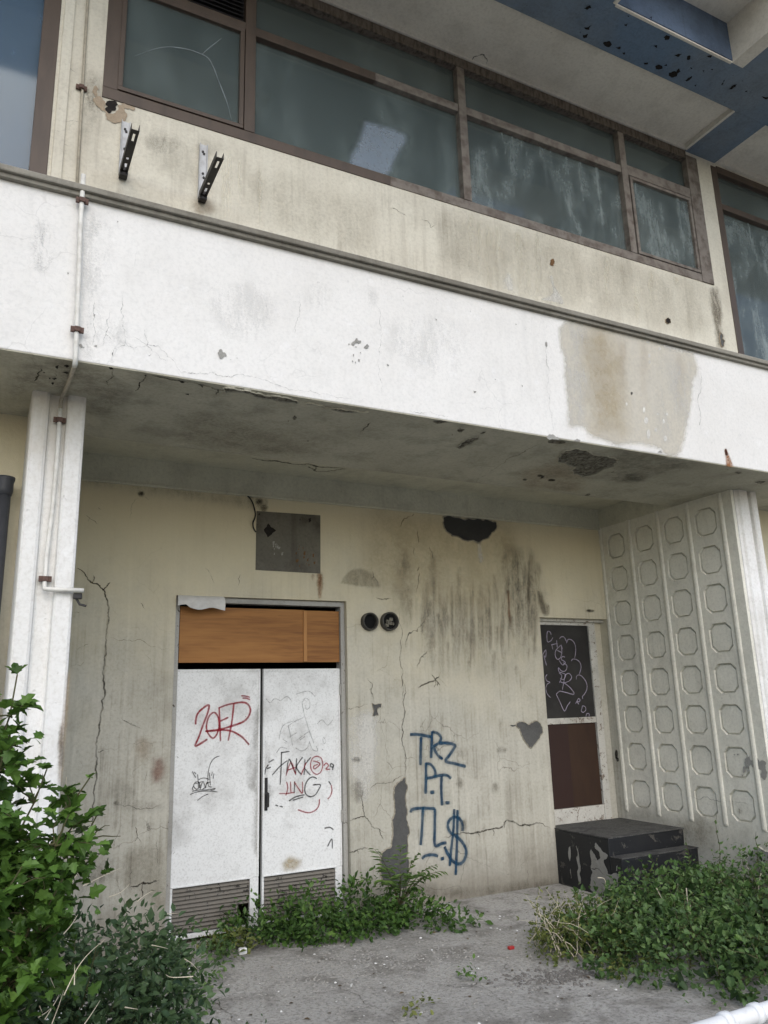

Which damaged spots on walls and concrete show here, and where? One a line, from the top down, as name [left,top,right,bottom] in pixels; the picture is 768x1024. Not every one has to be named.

peeling [644,54,713,86]
flaking render [92,86,135,123]
leakage [561,322,696,455]
crack [252,458,345,472]
spalling [546,434,619,478]
flaking render [442,516,497,543]
crack [78,568,141,824]
crack [448,820,546,838]
peeling [568,843,619,895]